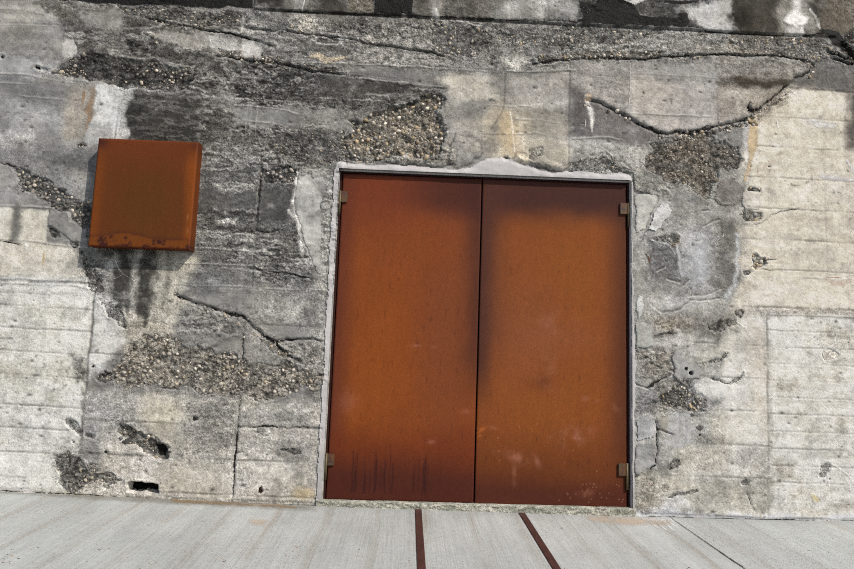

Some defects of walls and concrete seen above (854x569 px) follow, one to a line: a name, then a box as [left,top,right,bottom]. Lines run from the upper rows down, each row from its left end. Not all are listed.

crack [535,26,854,144]
spalling [260,93,446,184]
spalling [644,116,755,199]
leakage [104,248,158,327]
spalling [92,333,329,402]
crack [174,293,310,363]
crack [221,387,300,504]